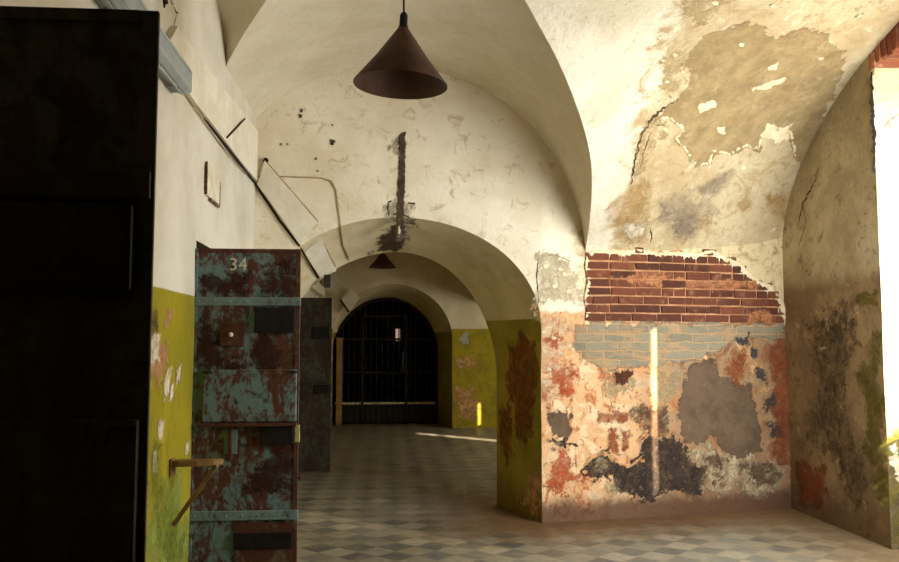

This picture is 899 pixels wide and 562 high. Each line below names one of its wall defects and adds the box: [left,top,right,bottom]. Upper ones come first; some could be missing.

peeling [655,0,848,167]
water stain [368,219,419,256]
water stain [624,223,652,242]
peeling [150,305,182,401]
peeling [455,332,477,368]
spalling [498,247,786,467]
peeling [452,385,479,422]
water stain [805,299,868,507]
peeling [152,420,164,472]
peeling [516,468,541,518]
peeling [580,431,786,503]